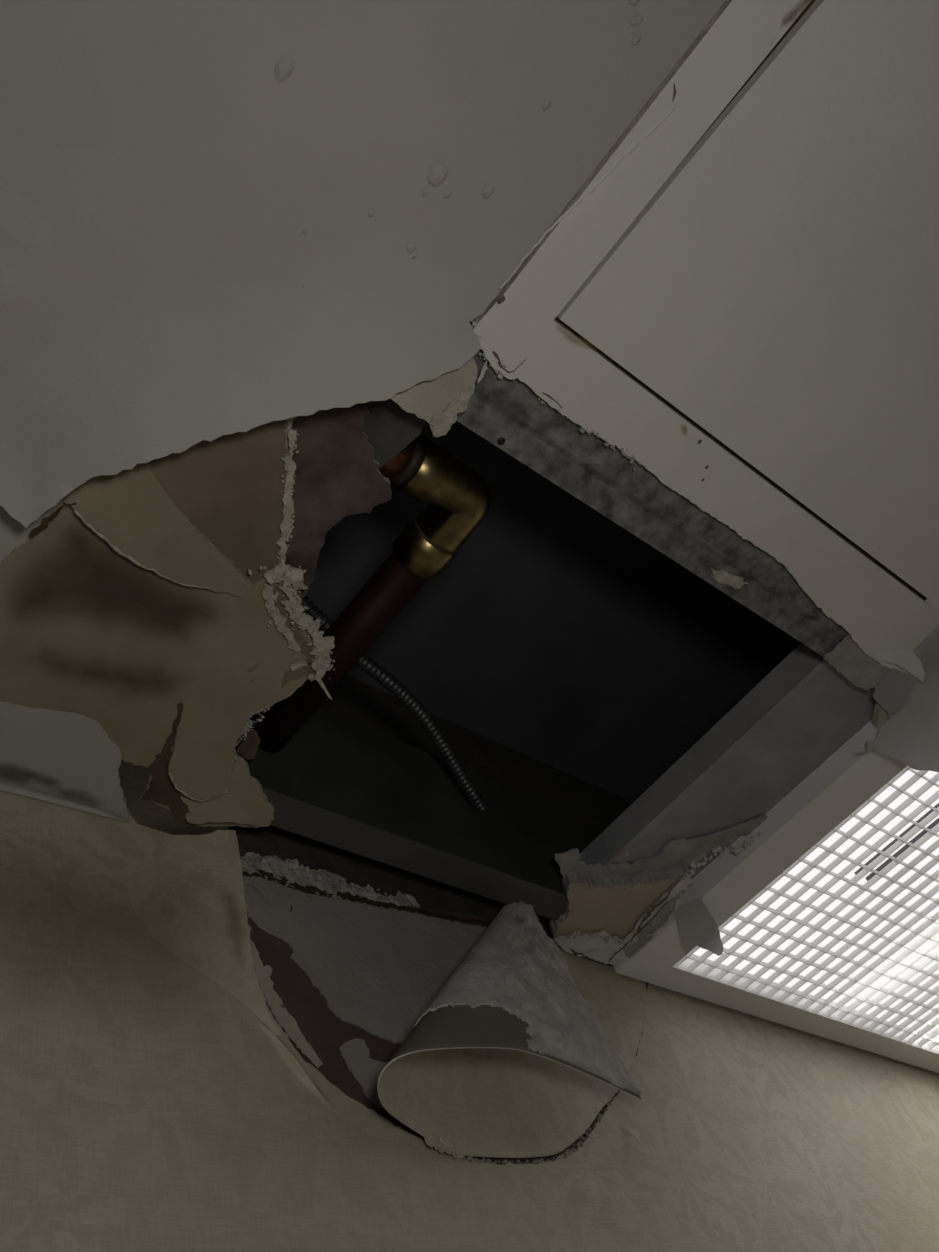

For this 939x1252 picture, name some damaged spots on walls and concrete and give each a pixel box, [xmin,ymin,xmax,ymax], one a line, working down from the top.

flaking render [823,635,883,690]
peeling [0,419,646,1158]
flaking render [554,815,767,880]